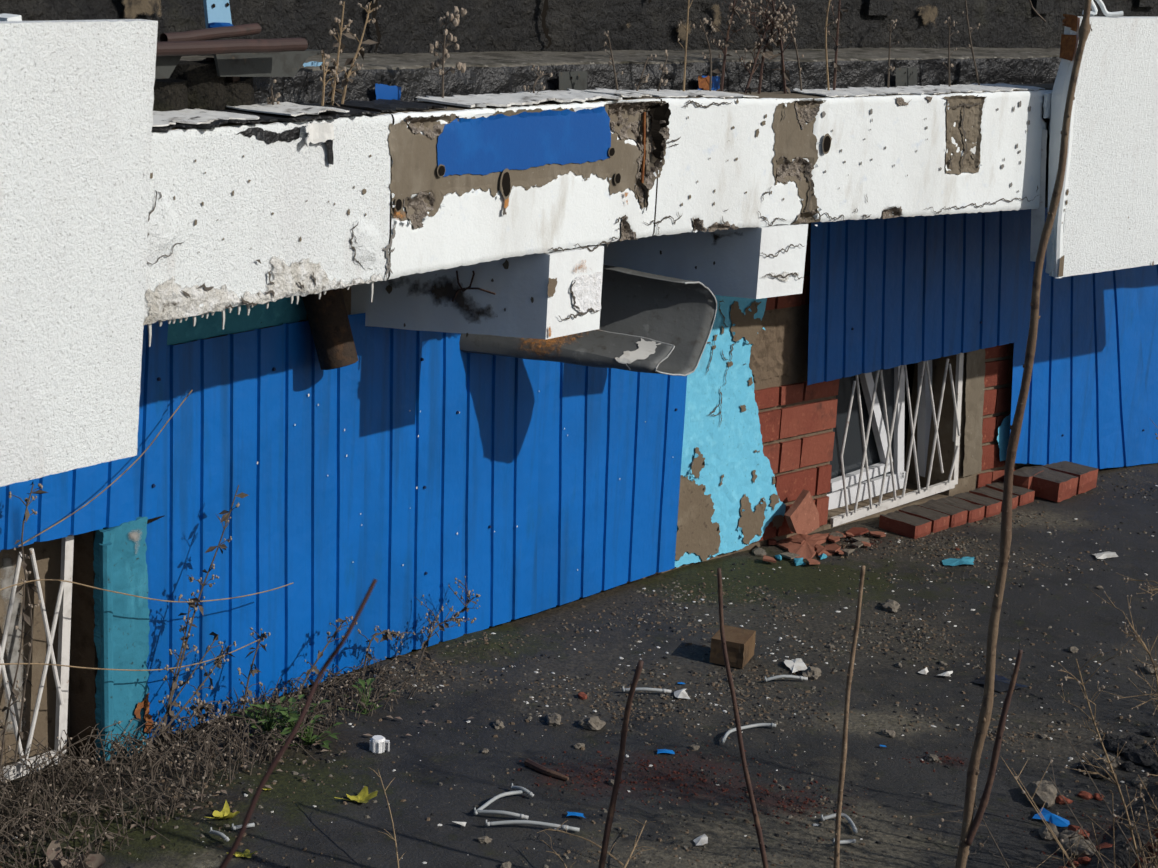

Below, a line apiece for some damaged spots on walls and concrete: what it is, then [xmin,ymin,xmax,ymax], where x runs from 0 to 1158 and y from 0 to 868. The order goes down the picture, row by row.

peeling [238,127,301,144]
peeling [388,101,671,229]
peeling [756,98,849,226]
peeling [926,95,999,175]
spalling [620,215,638,241]
crack [758,164,870,282]
spalling [143,248,394,347]
peeling [712,300,765,349]
peeling [675,447,724,561]
peeling [738,470,784,545]